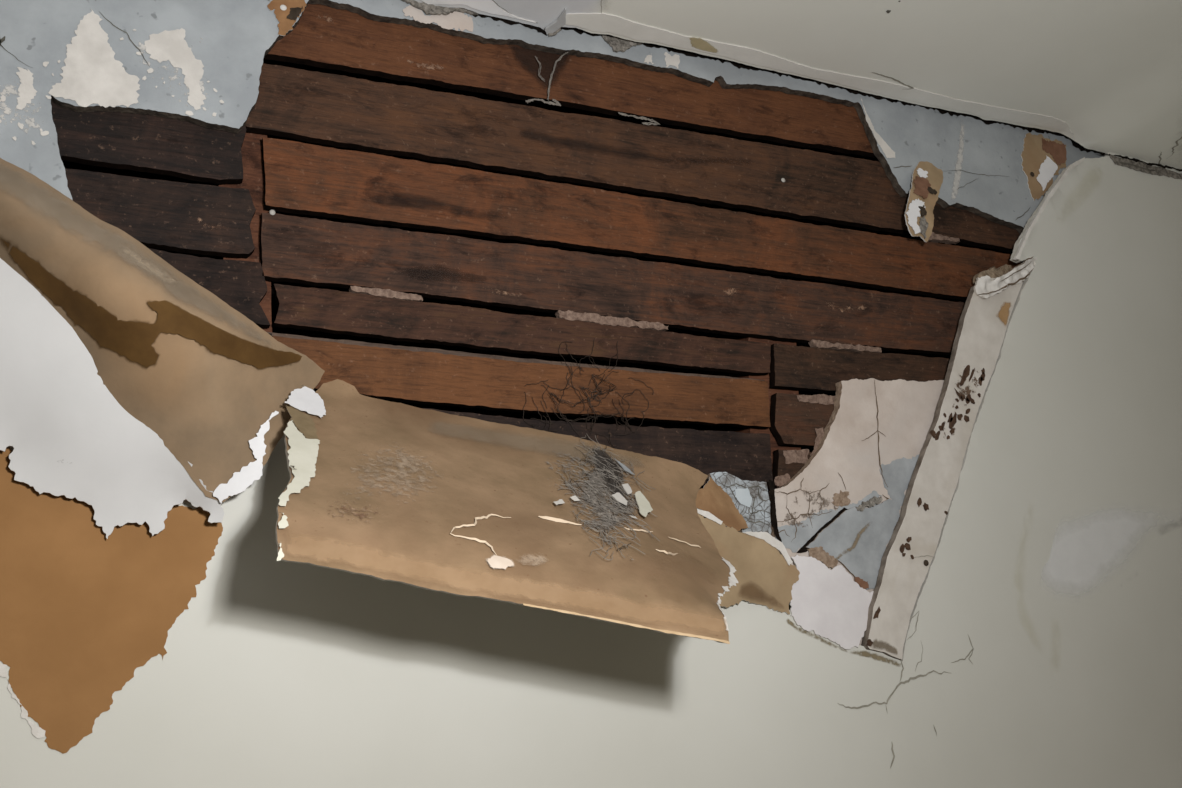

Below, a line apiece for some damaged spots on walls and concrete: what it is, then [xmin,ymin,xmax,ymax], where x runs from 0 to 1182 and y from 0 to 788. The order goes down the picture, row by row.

peeling [0,9,224,145]
crack [103,16,150,67]
peeling [401,0,479,32]
spalling [263,59,895,162]
crack [473,0,1182,173]
spalling [271,281,732,377]
peeling [213,385,326,529]
spalling [381,399,730,431]
peeling [612,458,653,519]
peeling [775,454,929,569]
peeling [930,365,985,440]
crack [838,612,974,714]